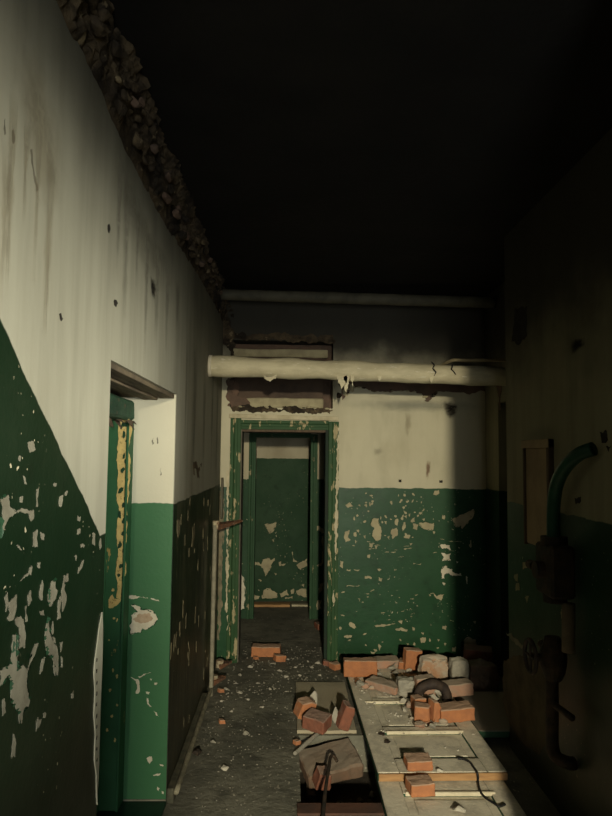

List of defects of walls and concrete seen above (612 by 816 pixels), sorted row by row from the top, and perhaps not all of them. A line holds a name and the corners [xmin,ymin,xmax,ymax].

spalling [56,0,236,355]
flaking render [226,378,333,415]
peeling [0,488,39,538]
peeling [33,529,45,547]
peeling [75,516,102,573]
peeling [210,470,230,640]
peeling [241,552,307,610]
peeling [332,428,475,606]
peeling [0,574,69,723]
peeling [93,419,132,805]
peeling [129,597,159,635]
spalling [375,611,456,656]